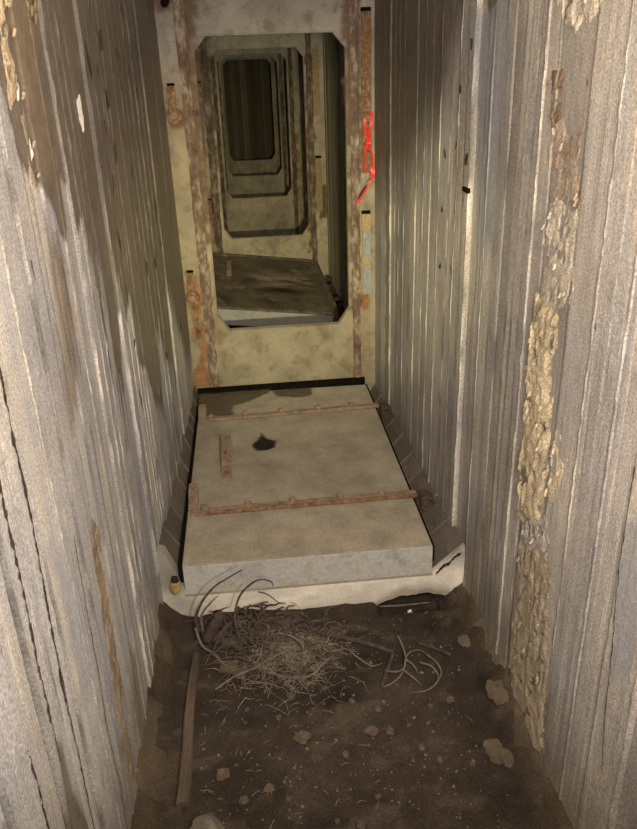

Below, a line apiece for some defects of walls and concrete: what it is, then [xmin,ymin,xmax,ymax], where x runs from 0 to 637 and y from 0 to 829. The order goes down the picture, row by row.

spalling [0,0,38,149]
spalling [557,0,602,34]
rust [186,283,210,386]
damp [253,436,276,450]
spalling [485,68,585,755]
crack [0,368,95,829]